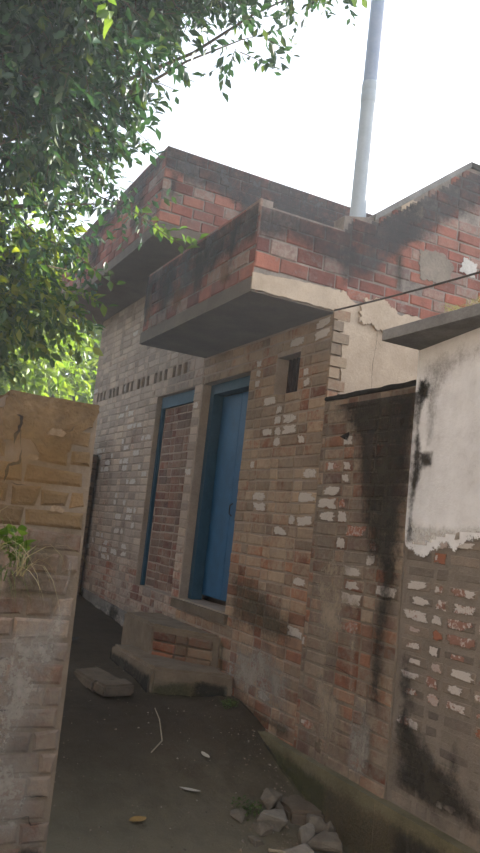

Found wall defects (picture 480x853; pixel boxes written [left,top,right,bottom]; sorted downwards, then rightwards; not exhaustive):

peeling [314,316,331,341]
spalling [358,297,402,332]
peeling [262,397,304,446]
crack [4,414,23,485]
peeling [252,492,266,511]
peeling [274,462,367,549]
peeling [434,532,475,565]
peeling [341,543,376,606]
peeling [376,585,397,598]
peeling [287,625,305,644]
peeling [401,581,480,715]